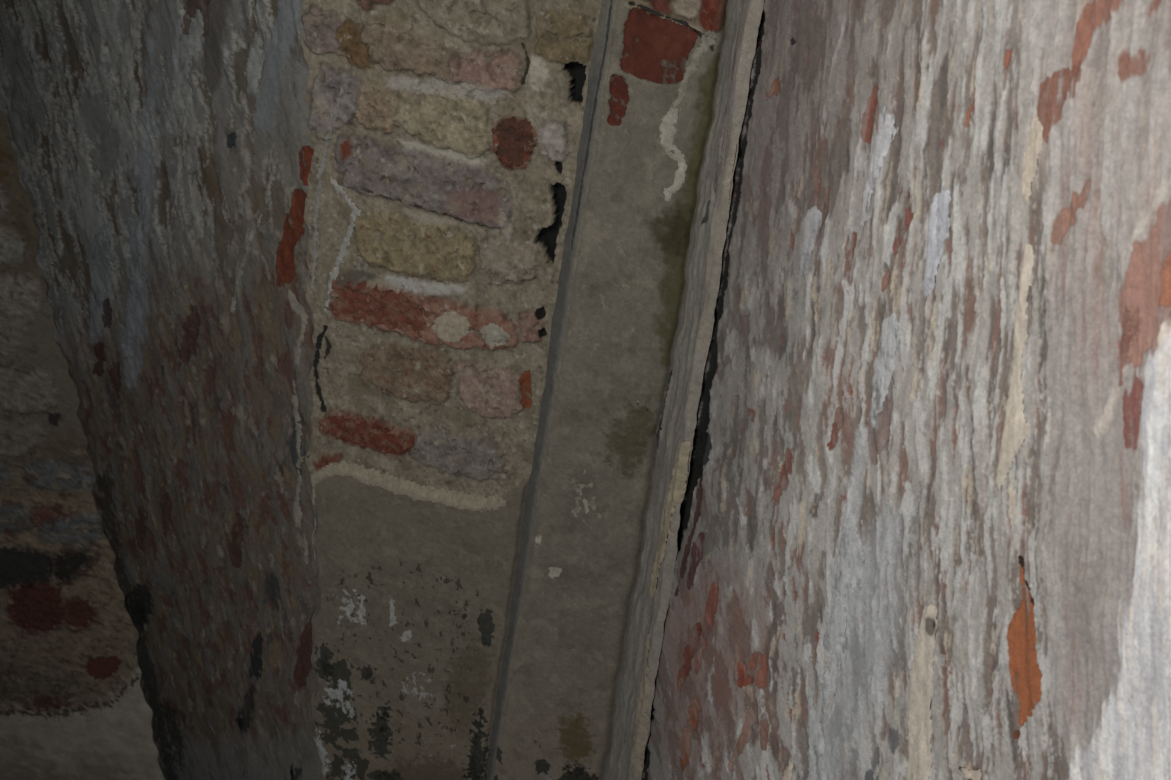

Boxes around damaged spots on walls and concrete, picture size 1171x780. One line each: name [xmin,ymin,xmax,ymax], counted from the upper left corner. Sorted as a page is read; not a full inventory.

crack [572,0,715,246]
leakage [659,30,716,202]
crack [313,325,331,412]
spalling [276,87,510,366]
crack [675,0,765,596]
flaking render [1118,199,1171,450]
flaking render [291,380,506,564]
leakage [314,556,503,780]
leakage [548,567,562,579]
leakage [533,740,599,780]
crack [642,702,655,780]
flaking render [1007,556,1043,739]